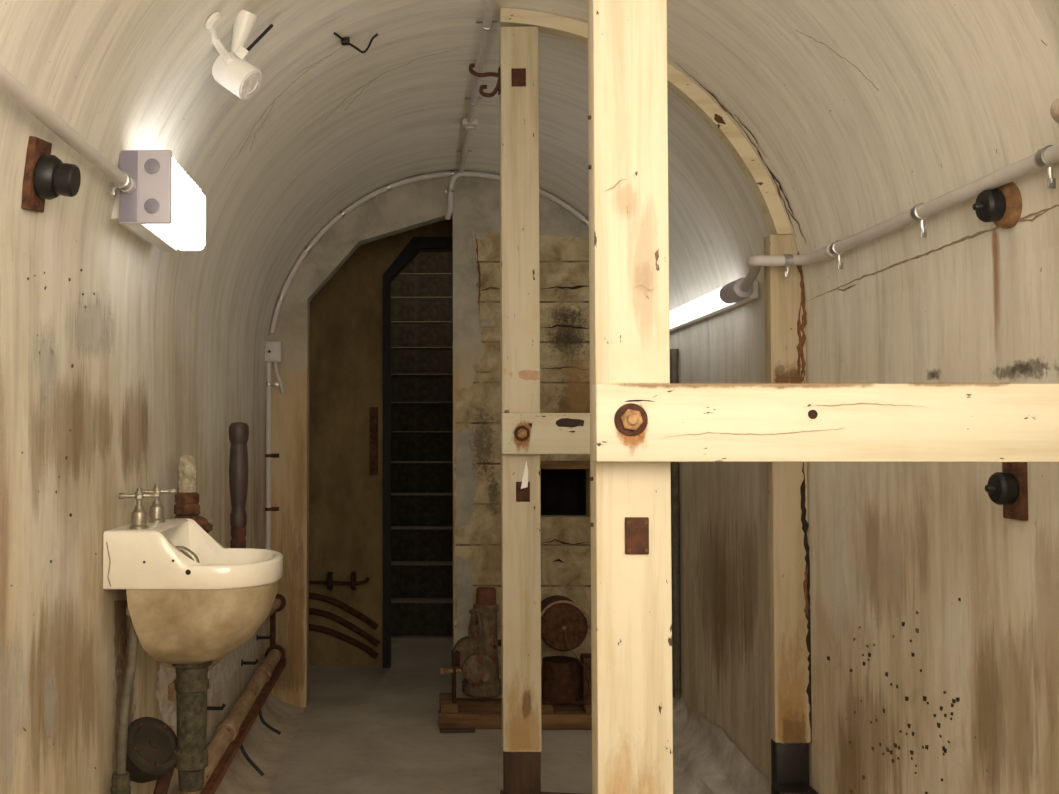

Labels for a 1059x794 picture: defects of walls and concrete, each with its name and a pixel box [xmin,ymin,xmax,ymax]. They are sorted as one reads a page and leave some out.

crack [672,63,1059,437]
rust [774,369,802,383]
rust [618,429,646,446]